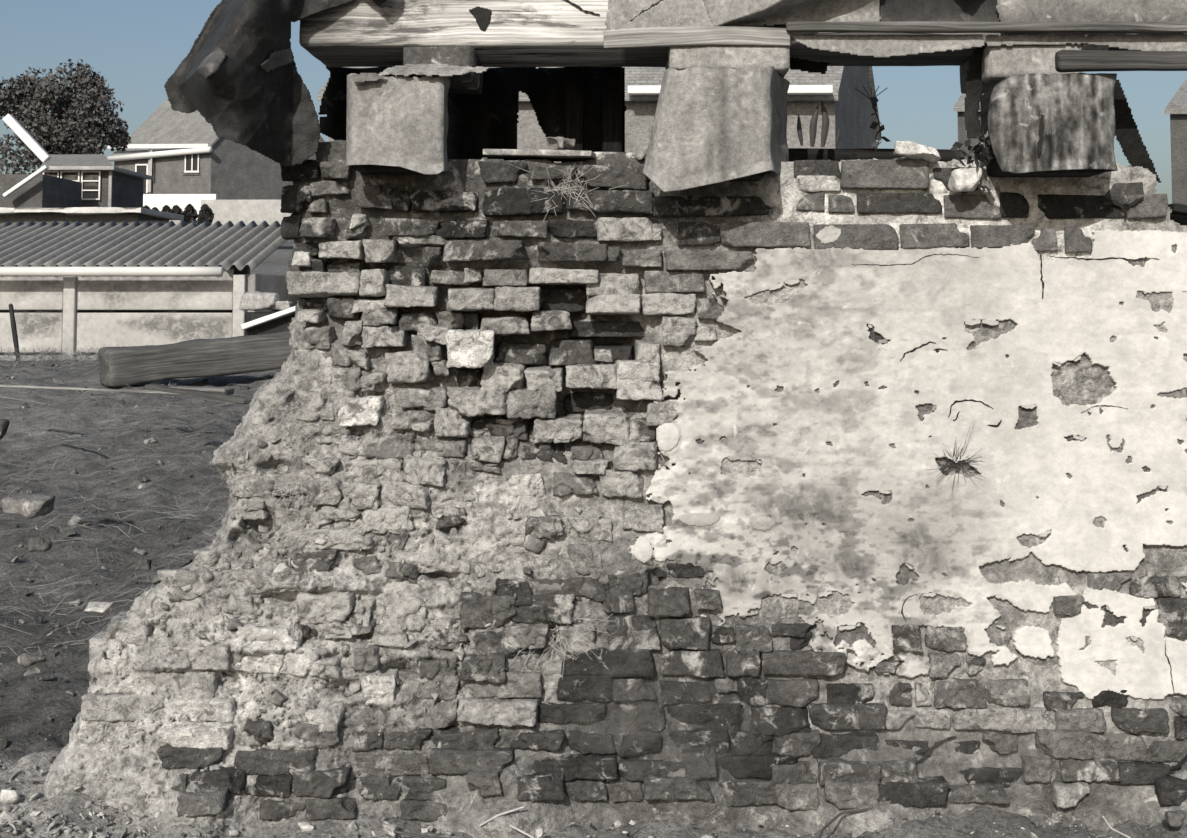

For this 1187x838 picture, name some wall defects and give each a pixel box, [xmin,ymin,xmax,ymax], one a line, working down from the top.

crack [852,254,980,266]
crack [1040,253,1159,299]
spalling [867,324,890,344]
spalling [964,320,1017,350]
peeling [1136,290,1173,340]
spalling [1051,353,1115,415]
spalling [1015,404,1038,429]
spalling [1017,530,1051,548]
spalling [896,563,972,615]
spalling [813,584,876,648]
spalling [1083,602,1126,628]
spalling [1126,605,1156,654]